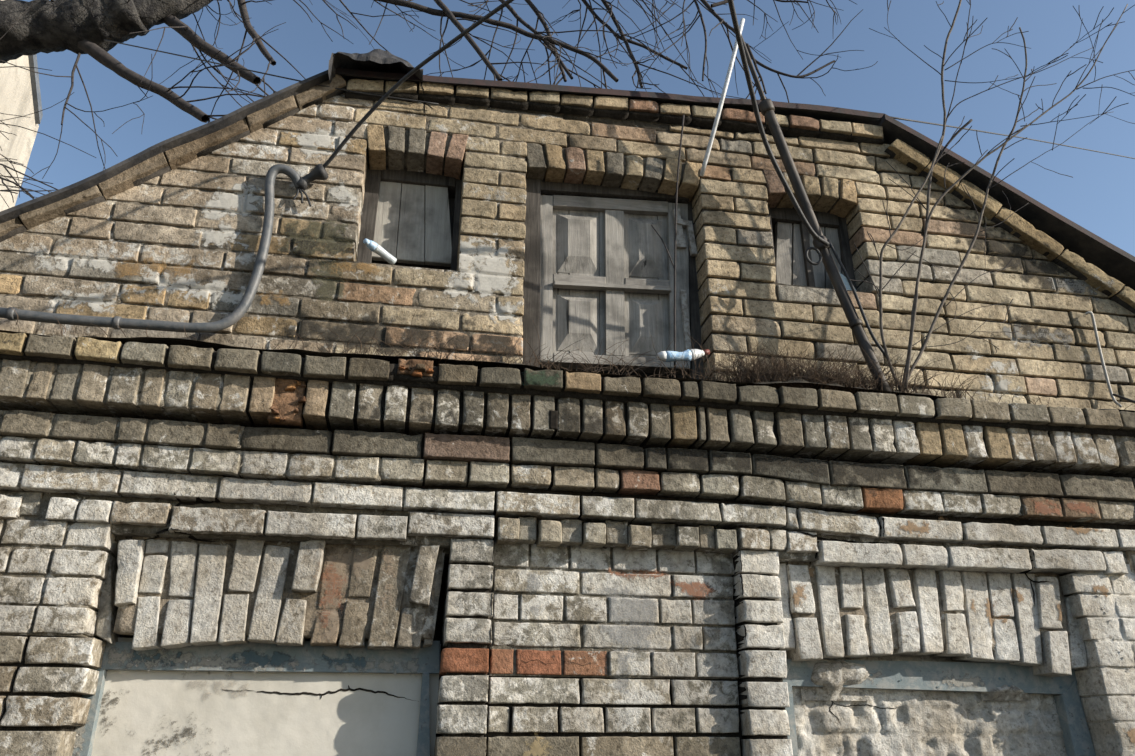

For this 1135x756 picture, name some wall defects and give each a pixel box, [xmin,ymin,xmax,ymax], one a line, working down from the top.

spalling [267,379,306,428]
crack [1020,551,1050,604]
crack [222,685,414,701]
crack [829,701,898,723]